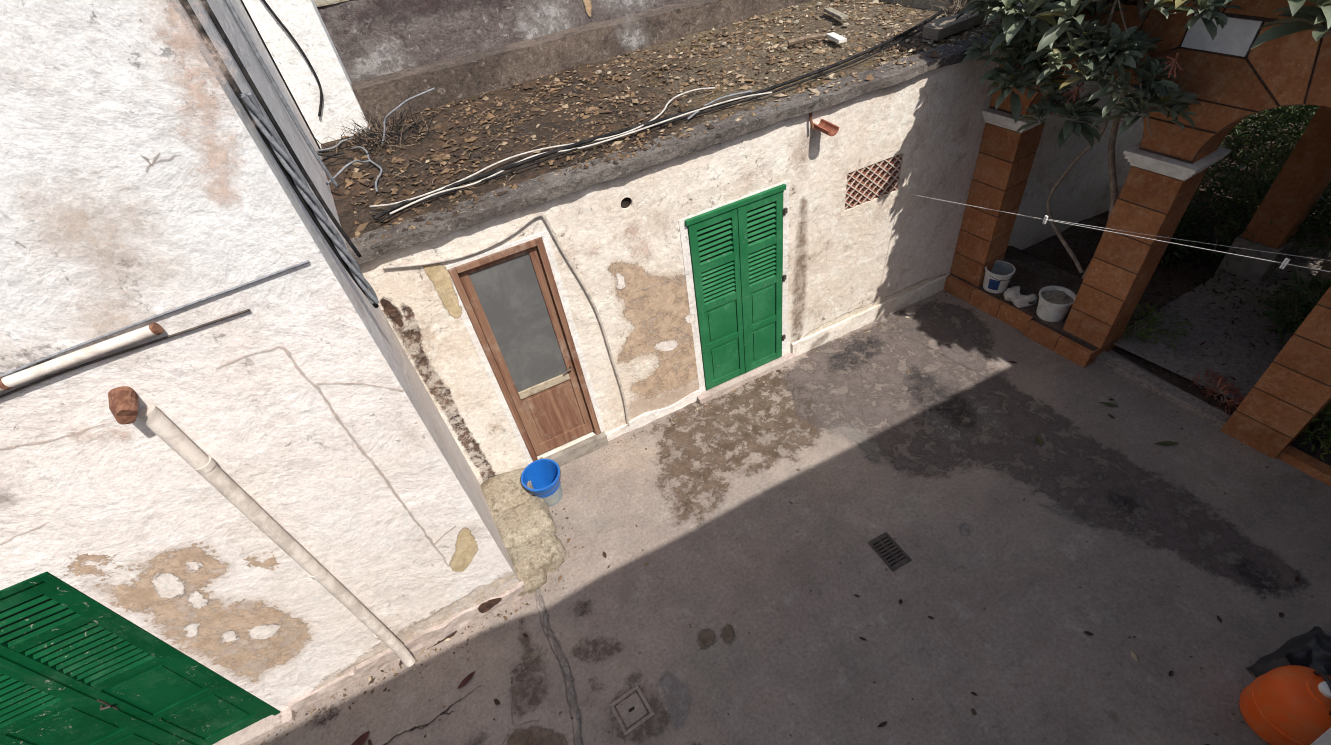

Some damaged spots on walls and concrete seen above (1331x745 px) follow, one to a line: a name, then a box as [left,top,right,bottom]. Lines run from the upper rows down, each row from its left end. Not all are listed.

crack [216,305,495,567]
flaking render [424,263,462,318]
flaking render [608,261,698,399]
leakage [633,199,1308,598]
flaking render [64,542,312,682]
crack [339,643,389,675]
crack [414,587,478,625]
flaking render [449,527,478,572]
crack [536,588,582,745]